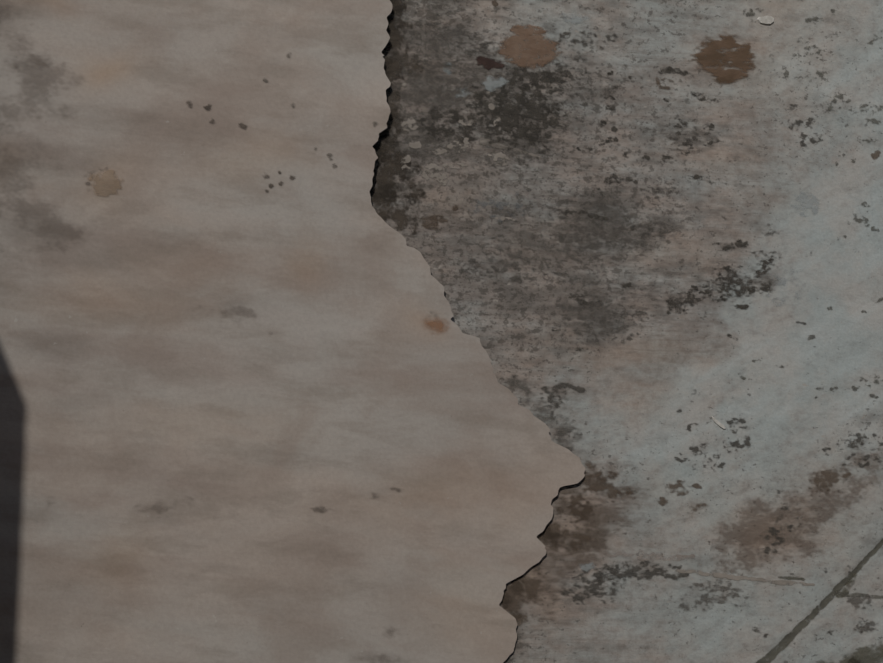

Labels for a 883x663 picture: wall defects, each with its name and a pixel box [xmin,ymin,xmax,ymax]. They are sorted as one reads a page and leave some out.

rust [476,25,560,70]
mould [558,31,617,48]
rust [692,35,755,84]
peeling [370,0,883,663]
water stain [500,463,739,625]
crack [756,539,883,663]
water stain [841,646,883,663]